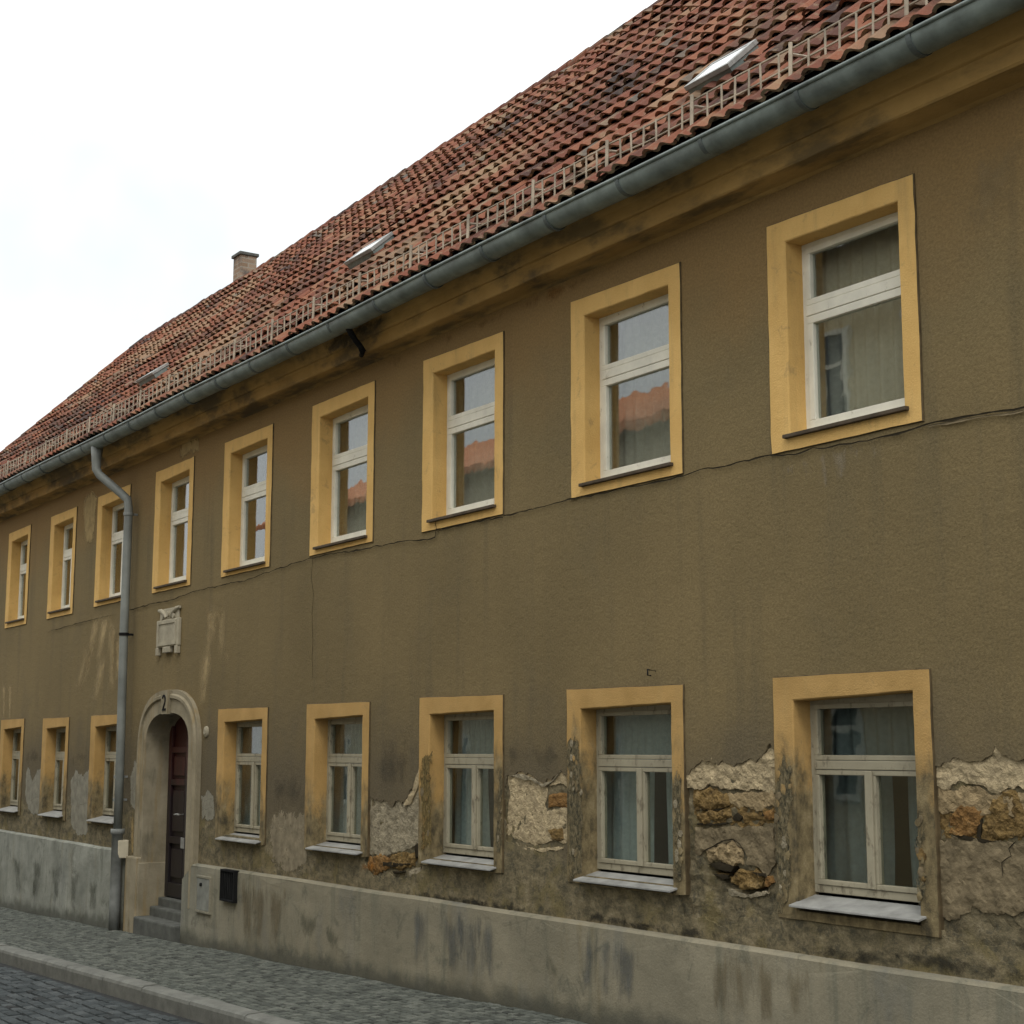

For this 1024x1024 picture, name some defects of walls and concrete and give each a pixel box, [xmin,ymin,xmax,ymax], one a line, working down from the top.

crack [51,406,1024,673]
spalling [366,751,433,879]
water stain [424,892,523,910]
spalling [506,737,583,883]
water stain [590,913,648,930]
spalling [672,745,793,926]
spalling [936,747,1024,951]